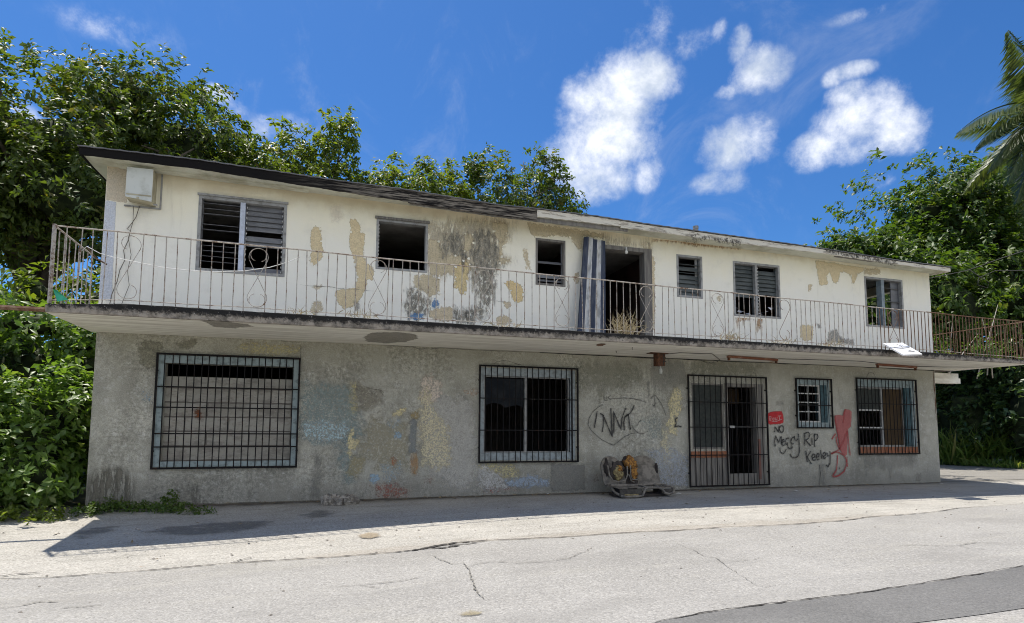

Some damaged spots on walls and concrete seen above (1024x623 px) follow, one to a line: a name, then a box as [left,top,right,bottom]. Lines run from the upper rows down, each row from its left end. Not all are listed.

peeling [309,225,324,266]
peeling [335,219,374,309]
damp [428,219,510,324]
peeling [496,280,524,326]
peeling [808,260,880,291]
crack [2,504,1023,622]